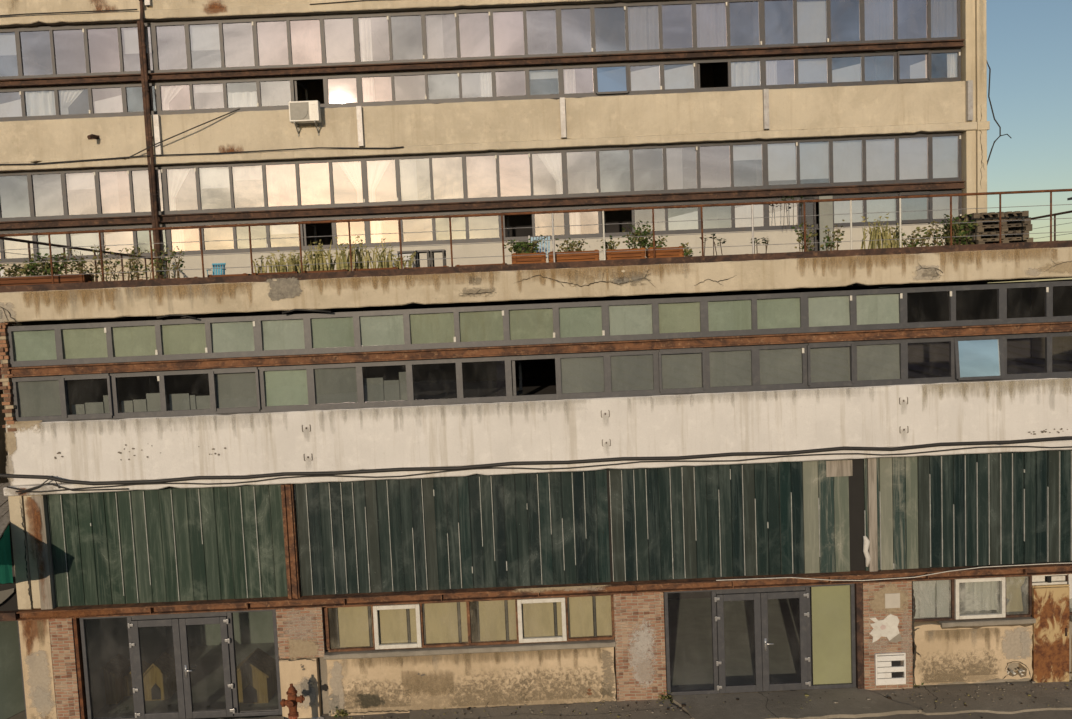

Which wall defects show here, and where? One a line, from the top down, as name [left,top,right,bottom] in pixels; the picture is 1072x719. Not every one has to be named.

corrosion [206,1,226,13]
water stain [25,288,117,309]
water stain [131,282,251,302]
water stain [311,271,493,291]
crack [462,271,654,294]
corrosion [26,497,44,582]
peeling [869,614,903,643]